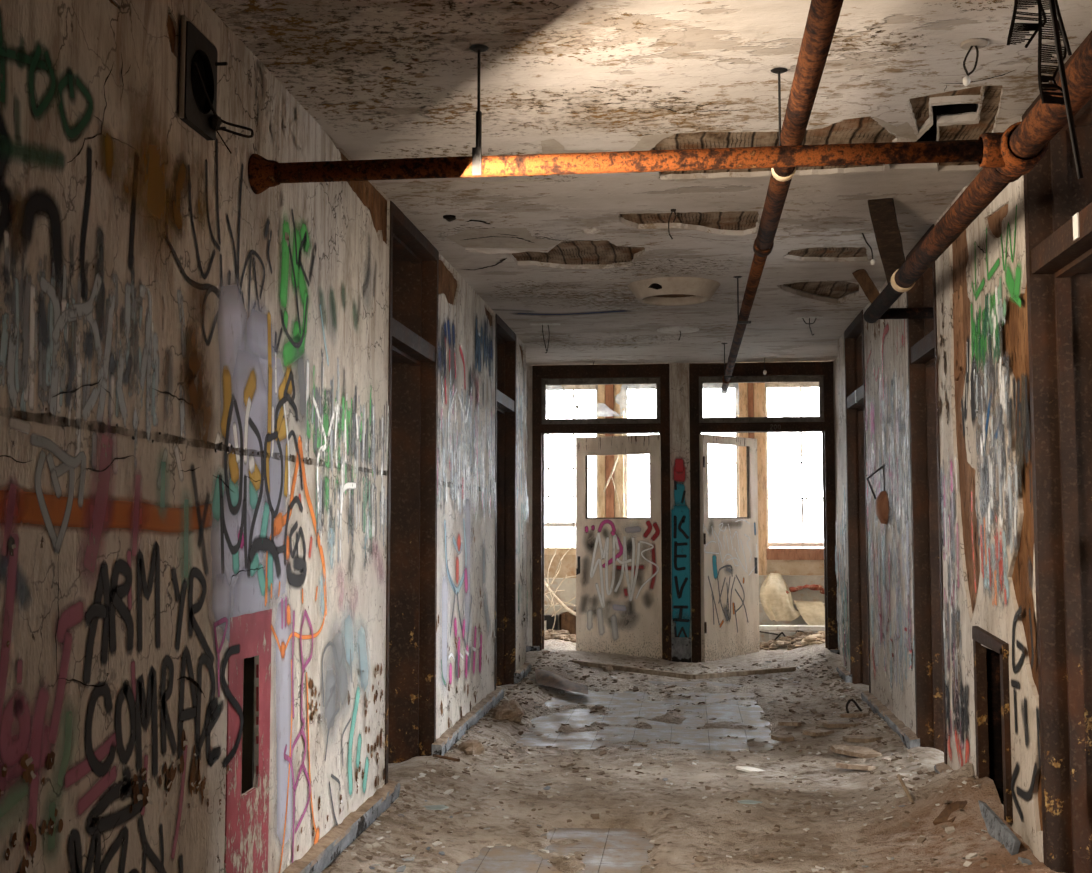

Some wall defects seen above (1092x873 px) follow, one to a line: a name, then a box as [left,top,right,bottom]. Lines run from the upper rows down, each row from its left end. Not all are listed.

leakage [209,0,748,159]